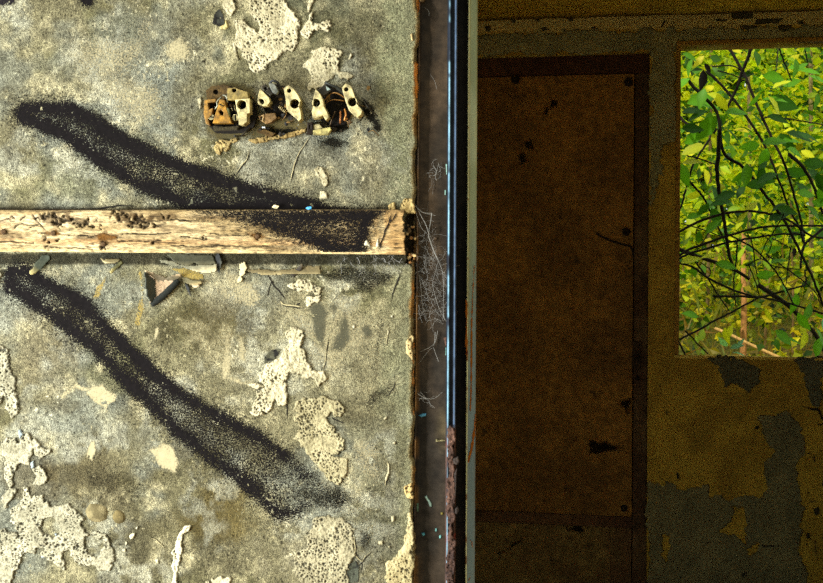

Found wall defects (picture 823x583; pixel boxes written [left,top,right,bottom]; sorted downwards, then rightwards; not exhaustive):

peeling [213,0,332,73]
peeling [303,46,353,91]
peeling [0,344,20,419]
peeling [247,326,349,485]
corrosion [445,266,476,583]
peeling [0,429,138,583]
peeling [644,411,820,583]
peeling [171,525,191,583]
peeling [293,515,359,583]
peeling [378,512,415,583]